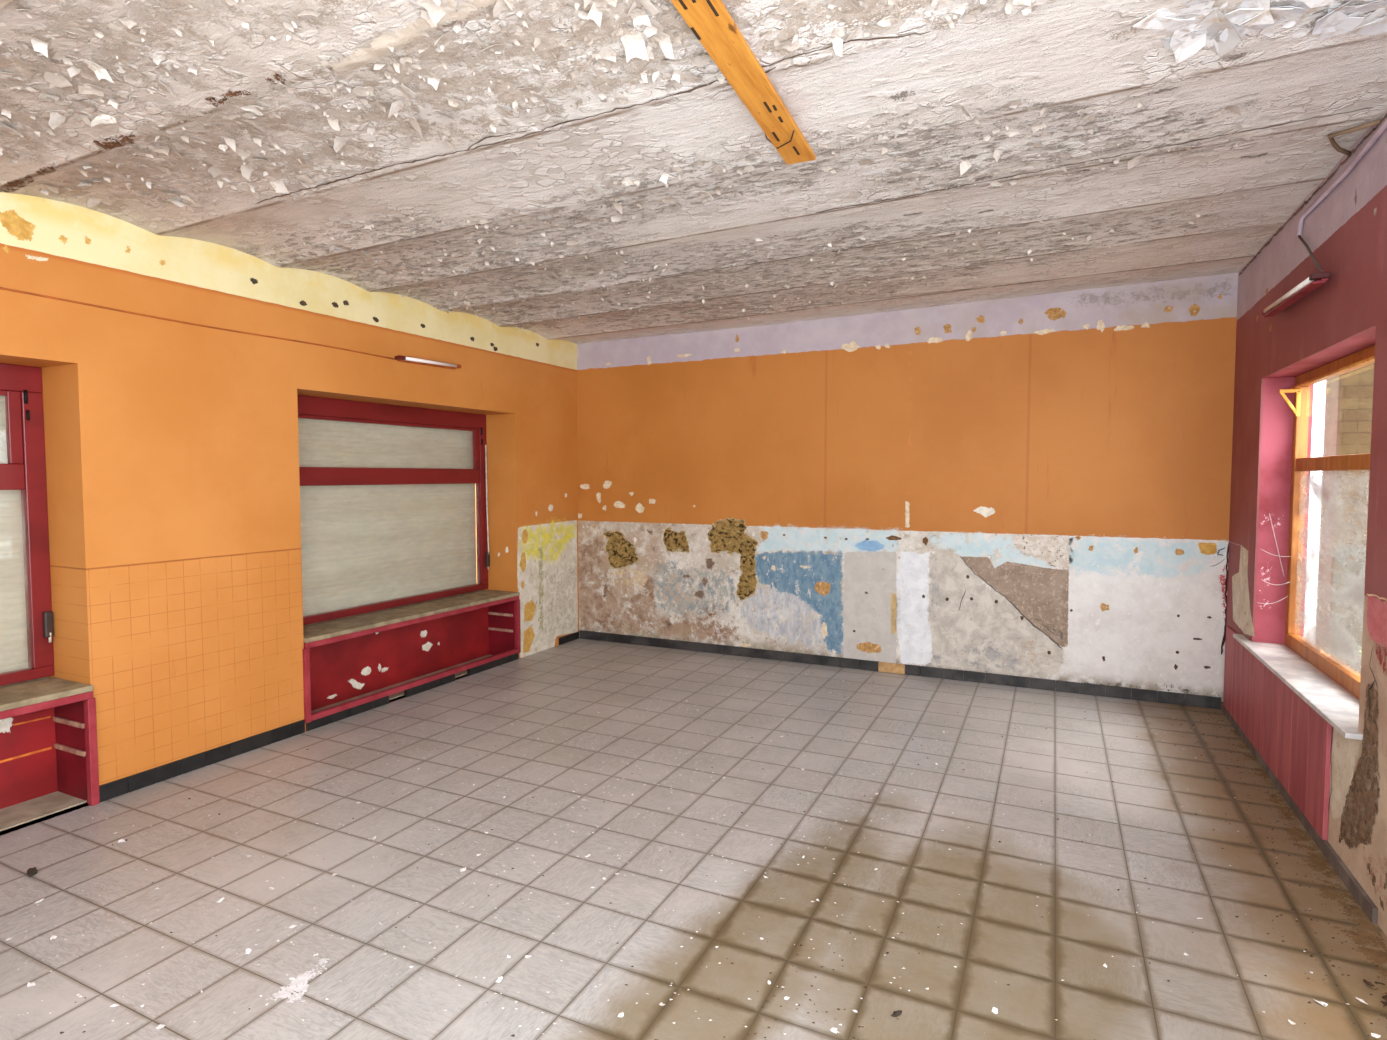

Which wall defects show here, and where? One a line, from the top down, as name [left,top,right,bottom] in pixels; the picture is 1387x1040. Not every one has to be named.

peeling [721,0,1090,70]
peeling [1104,0,1387,66]
peeling [0,0,737,217]
peeling [0,209,36,253]
peeling [222,69,1291,352]
flaking render [498,481,656,658]
flaking render [663,527,690,554]
flaking render [707,517,758,602]
flaking render [928,534,1094,678]
peeling [349,664,389,690]
peeling [0,717,13,733]
flaking render [1329,594,1387,850]